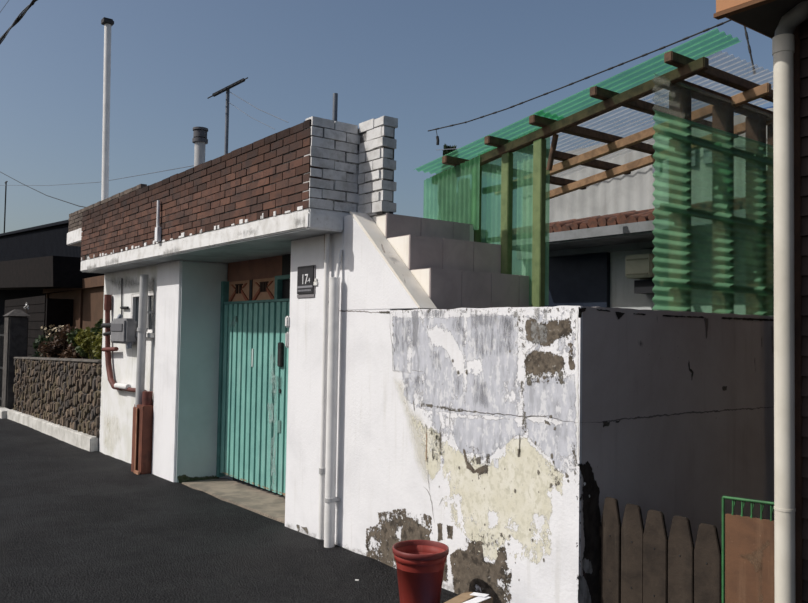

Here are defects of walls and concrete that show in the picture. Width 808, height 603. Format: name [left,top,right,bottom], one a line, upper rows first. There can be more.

peeling [365,307,601,603]
crack [421,380,771,457]